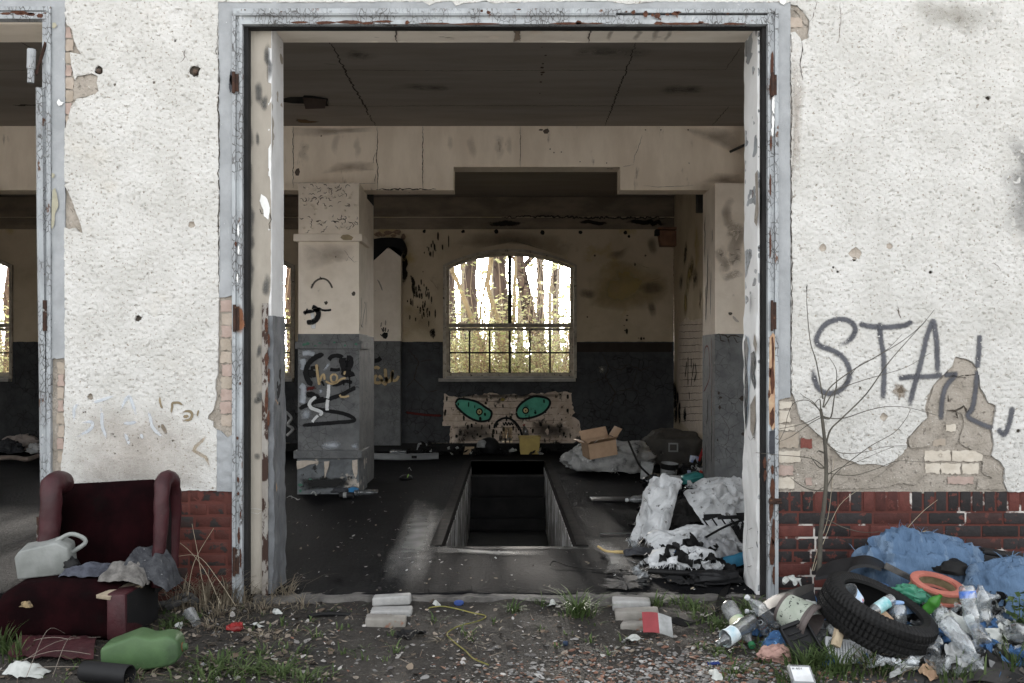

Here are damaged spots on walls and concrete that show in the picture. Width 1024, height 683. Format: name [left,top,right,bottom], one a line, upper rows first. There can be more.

rust [405,10,499,25]
rust [625,10,709,25]
flaking render [780,0,809,42]
flaking render [52,23,98,124]
crack [329,42,432,190]
crack [605,42,636,124]
flaking render [51,173,82,233]
flaking render [260,194,270,219]
flaking render [208,296,232,437]
flaking render [52,358,65,472]
flaking render [779,357,1007,494]